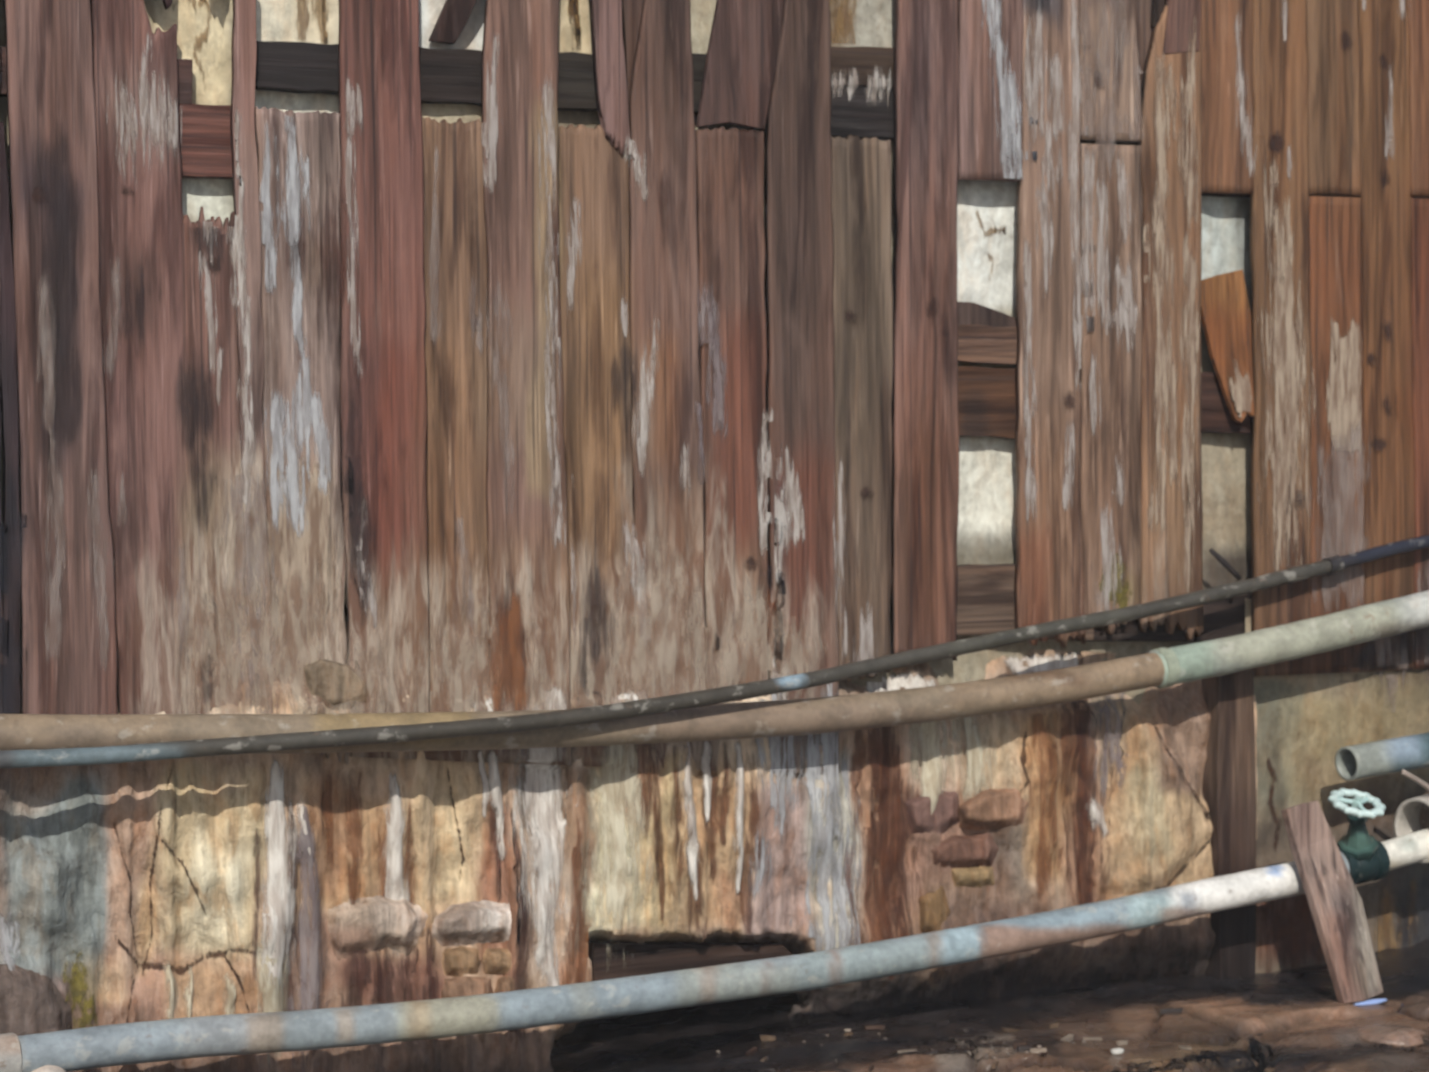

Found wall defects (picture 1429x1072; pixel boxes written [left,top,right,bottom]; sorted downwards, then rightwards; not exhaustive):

leakage [0,911,19,971]
crack [114,769,258,1023]
leakage [257,761,322,1013]
leakage [478,747,566,987]
leakage [736,732,860,951]